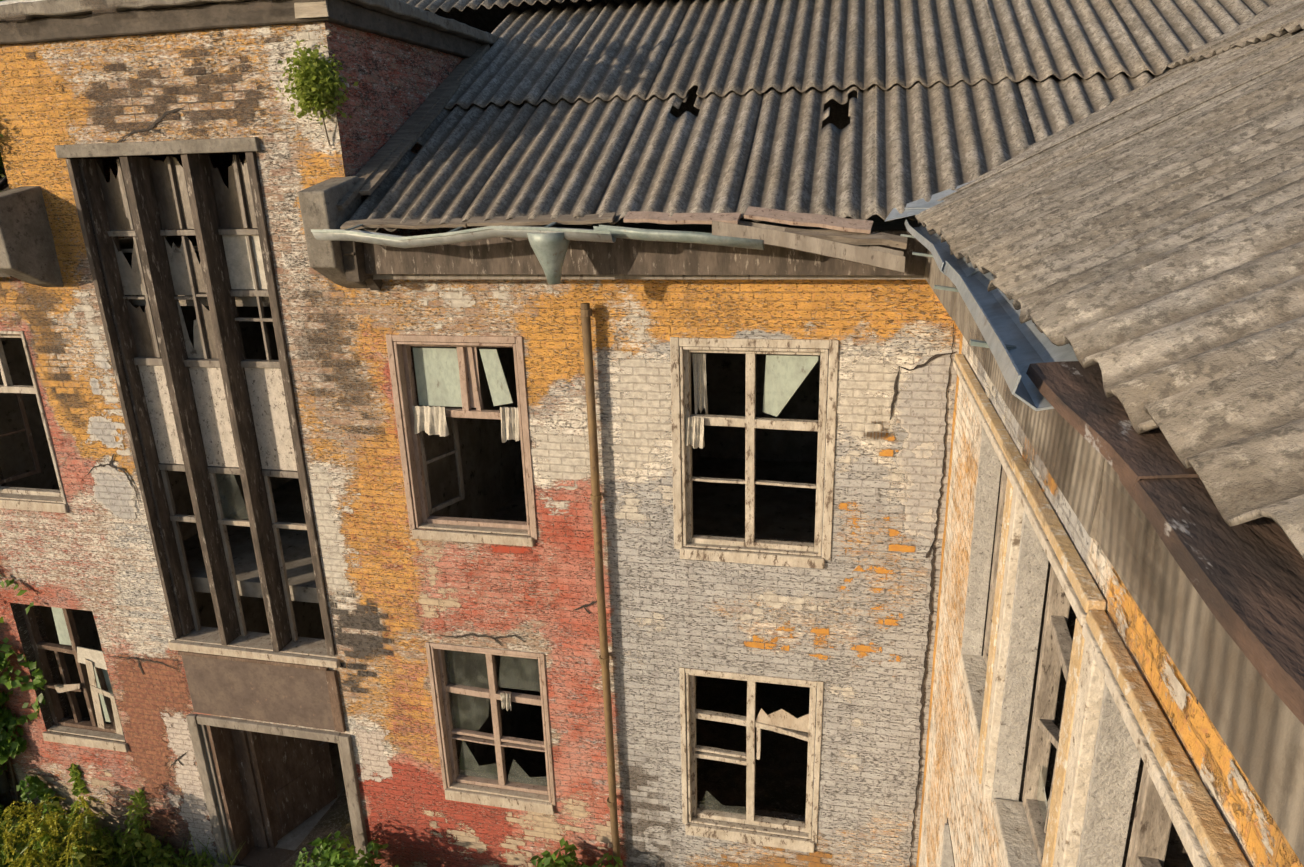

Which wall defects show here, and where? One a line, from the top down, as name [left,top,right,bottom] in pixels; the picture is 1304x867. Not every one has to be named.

spalling [82,49,279,142]
peeling [265,25,331,63]
spalling [53,290,141,528]
peeling [529,309,673,527]
peeling [309,463,363,604]
water stain [329,594,394,693]
flaking render [834,332,959,677]
crack [889,321,957,867]
spalling [113,652,220,865]
peeling [353,727,400,782]
peeling [422,798,621,867]
peeling [1200,758,1275,867]